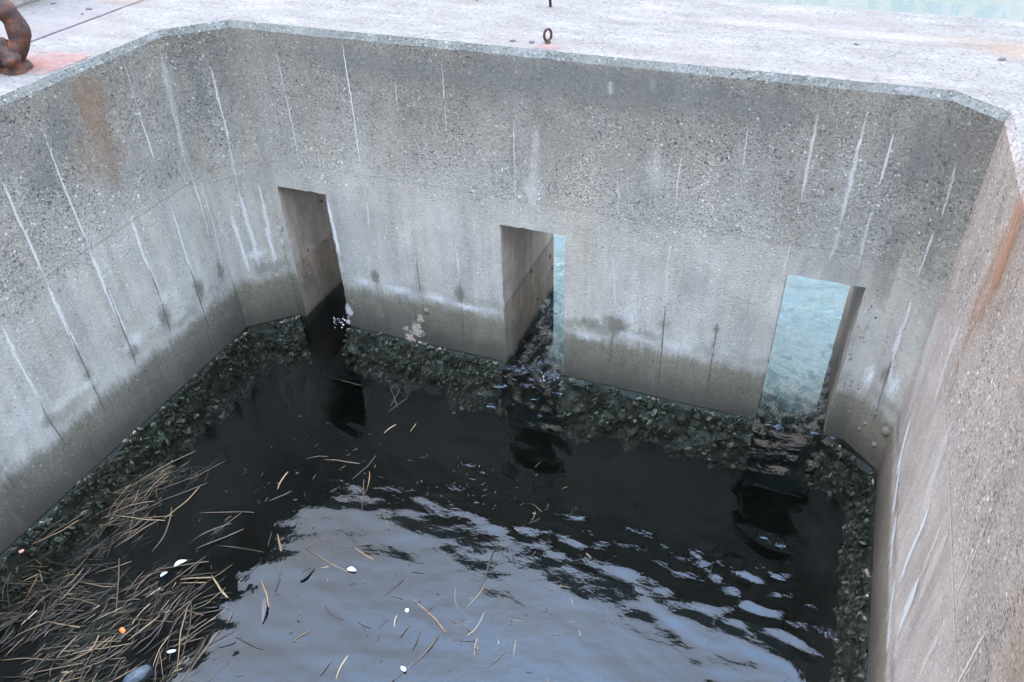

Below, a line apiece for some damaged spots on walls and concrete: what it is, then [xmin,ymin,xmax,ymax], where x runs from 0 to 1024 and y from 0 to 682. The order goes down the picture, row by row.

leakage [231,188,276,271]
leakage [608,316,626,331]
crack [657,313,665,381]
crack [707,327,718,389]